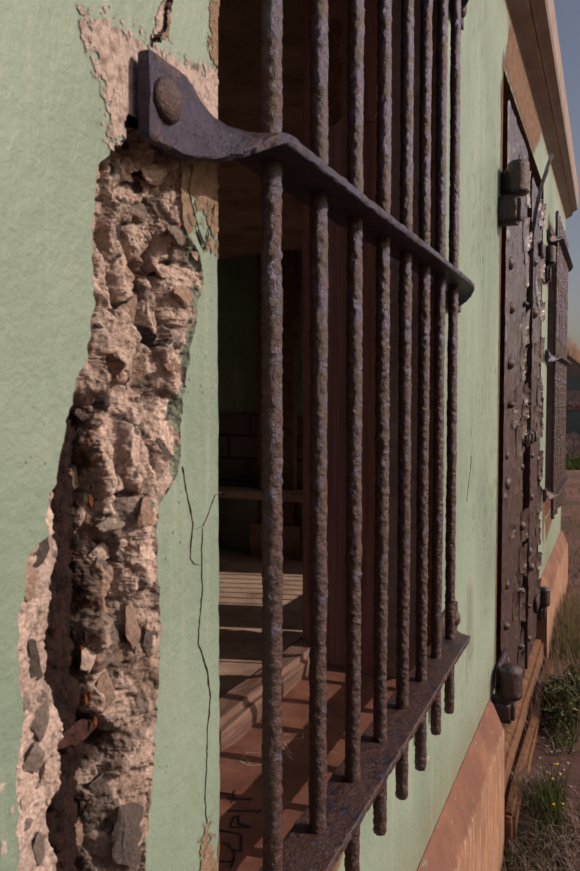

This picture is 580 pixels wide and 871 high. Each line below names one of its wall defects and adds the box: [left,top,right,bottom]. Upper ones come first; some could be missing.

crack [149,0,173,49]
spalling [0,0,220,871]
crack [182,466,222,824]